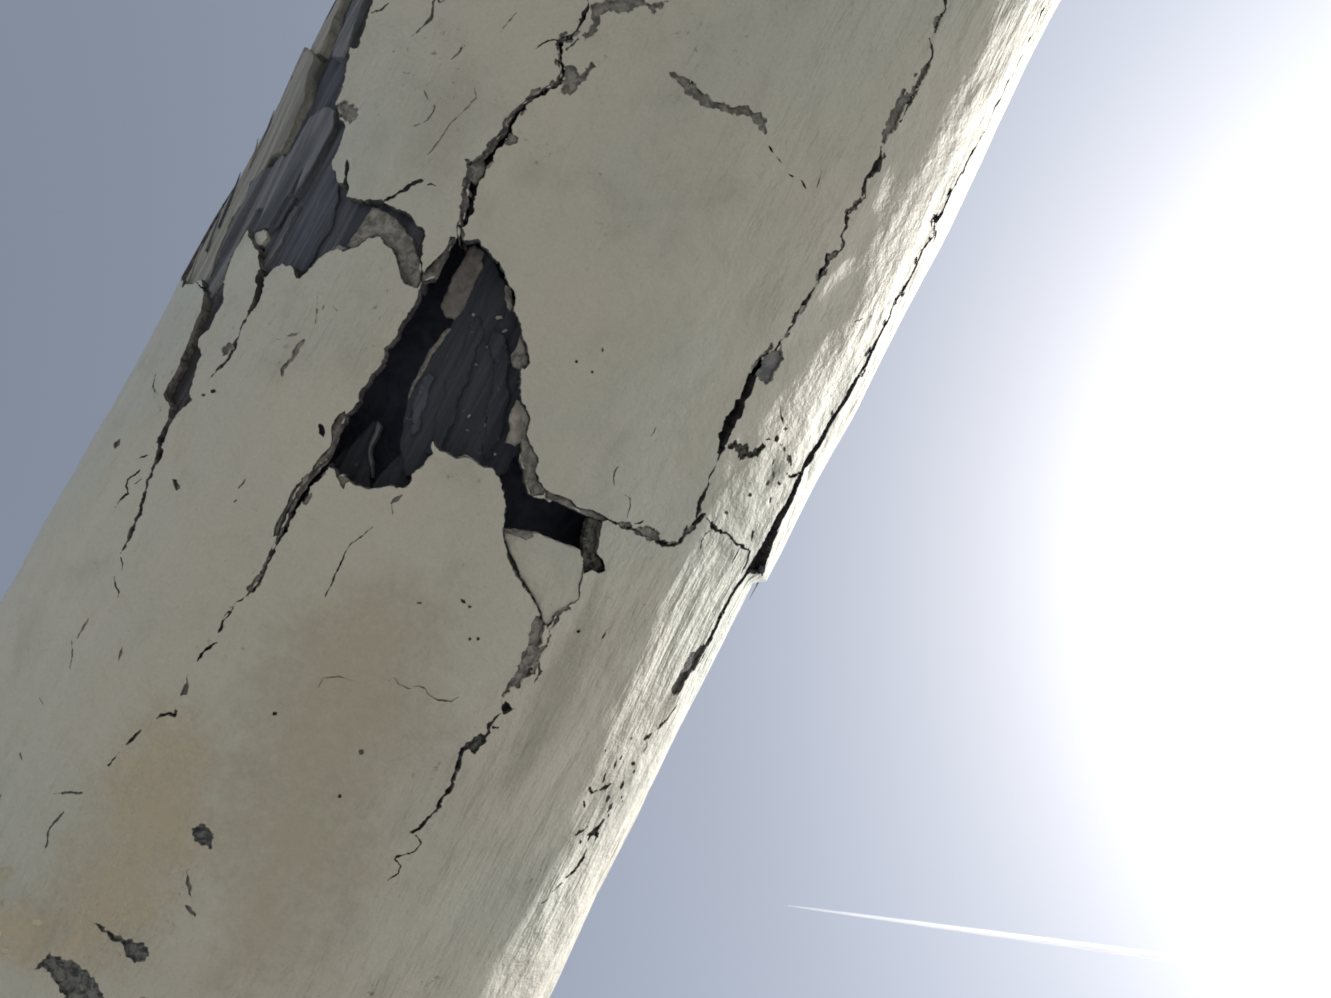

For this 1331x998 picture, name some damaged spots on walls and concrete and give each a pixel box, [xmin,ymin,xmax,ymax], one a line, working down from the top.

crack [383,0,665,251]
peeling [669,71,822,189]
crack [45,791,83,848]
crack [114,269,272,595]
peeling [191,823,214,850]
crack [107,455,334,767]
crack [280,297,337,377]
crack [324,495,402,597]
spalling [181,0,606,629]
crack [387,535,572,881]
crack [606,0,1050,638]
peeling [34,952,104,998]